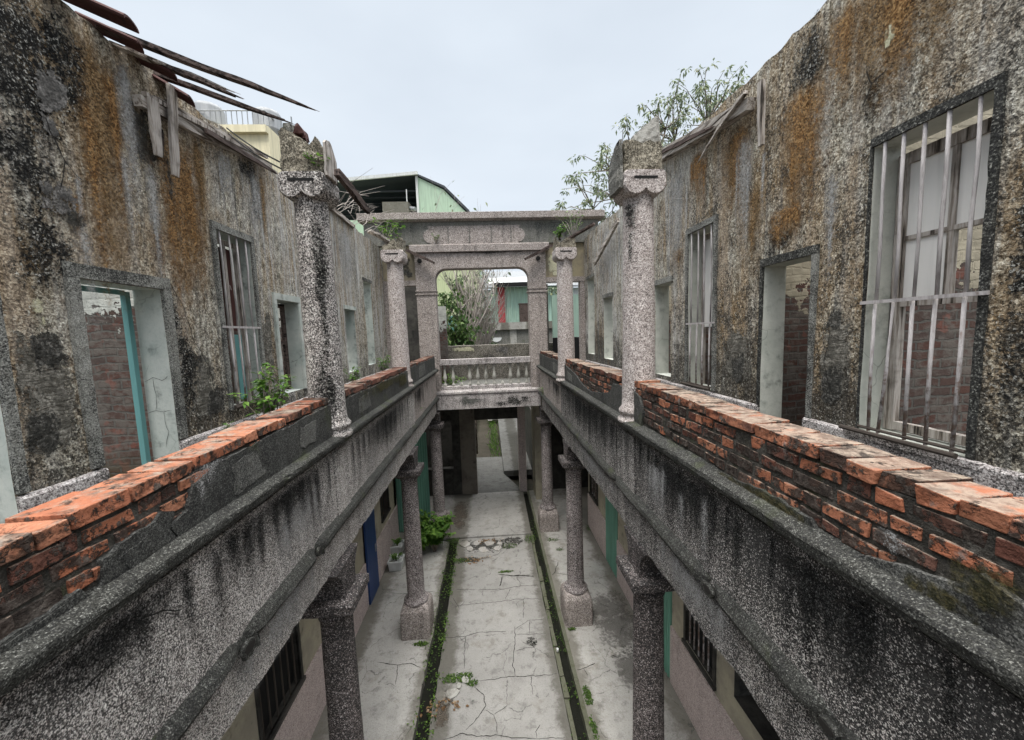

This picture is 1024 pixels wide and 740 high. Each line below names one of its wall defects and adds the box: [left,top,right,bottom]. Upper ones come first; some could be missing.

leakage [0,0,91,291]
leakage [120,69,160,257]
leakage [736,143,765,218]
leakage [788,10,832,108]
leakage [859,67,891,127]
leakage [0,566,199,736]
leakage [193,458,223,495]
leakage [211,461,333,635]
leakage [639,443,744,587]
leakage [659,536,732,647]
leakage [766,537,963,740]
leakage [884,530,904,552]